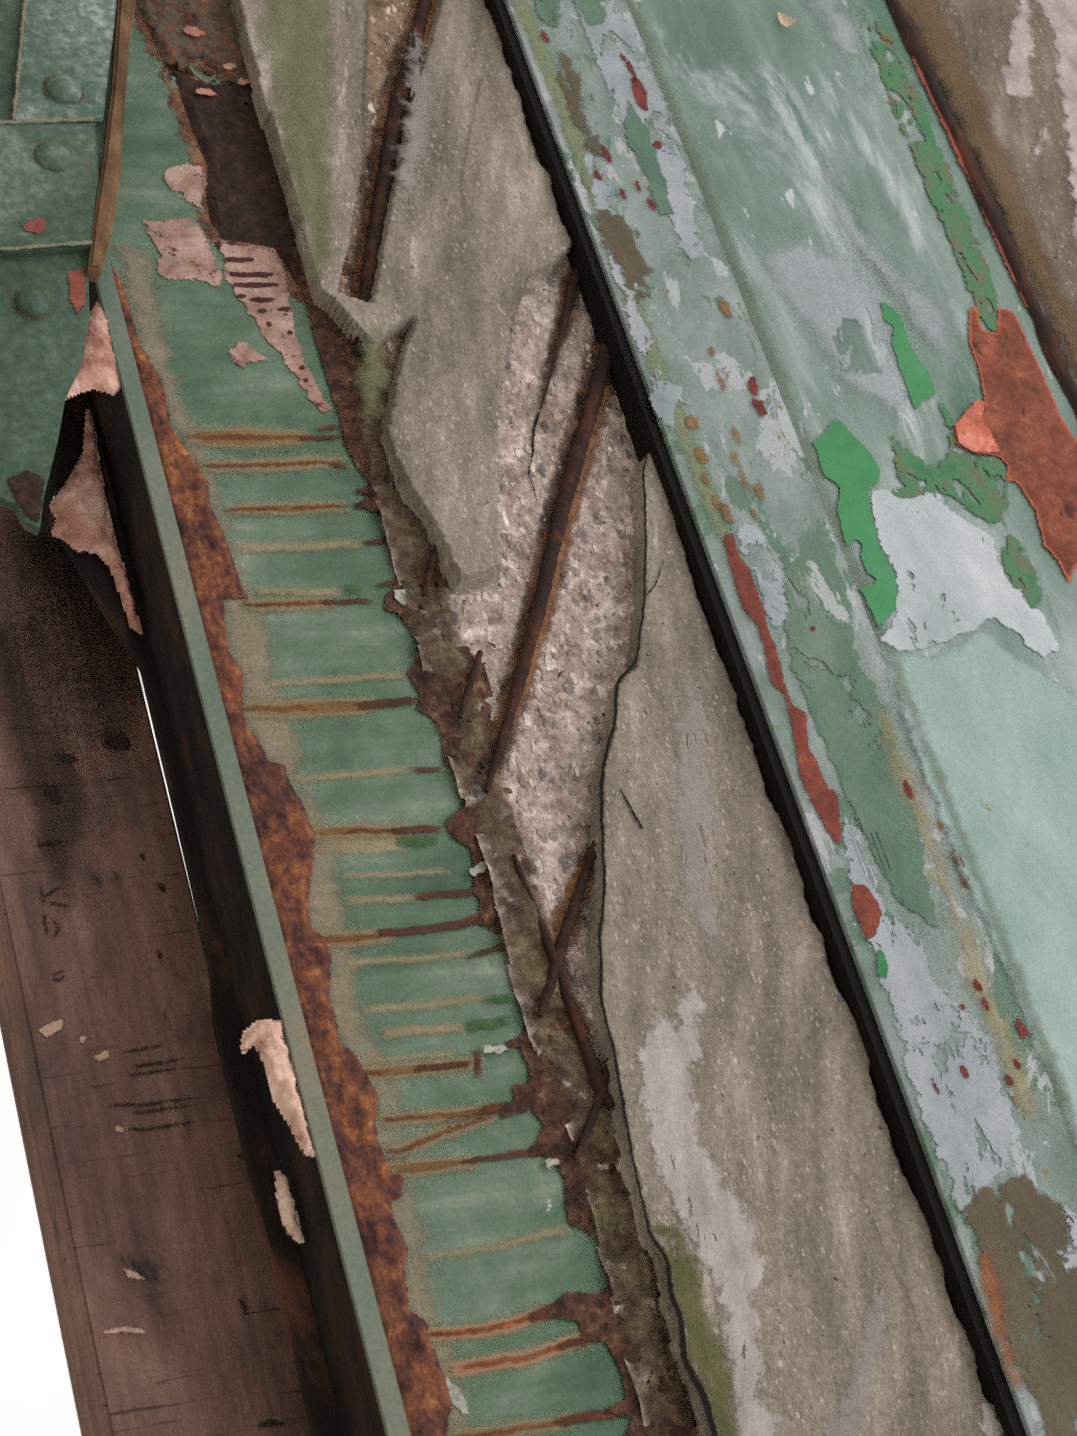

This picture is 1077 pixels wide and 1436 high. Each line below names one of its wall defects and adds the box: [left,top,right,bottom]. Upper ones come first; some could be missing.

peeling [117,162,332,527]
spalling [337,0,432,302]
rust [110,0,699,1436]
spalling [370,257,640,1168]
peeling [575,0,704,259]
rust [709,346,726,390]
rust [719,299,733,318]
rust [732,426,765,517]
rust [694,446,842,844]
peeling [814,301,1059,657]
crack [598,447,718,1436]
peeling [843,816,1077,1436]